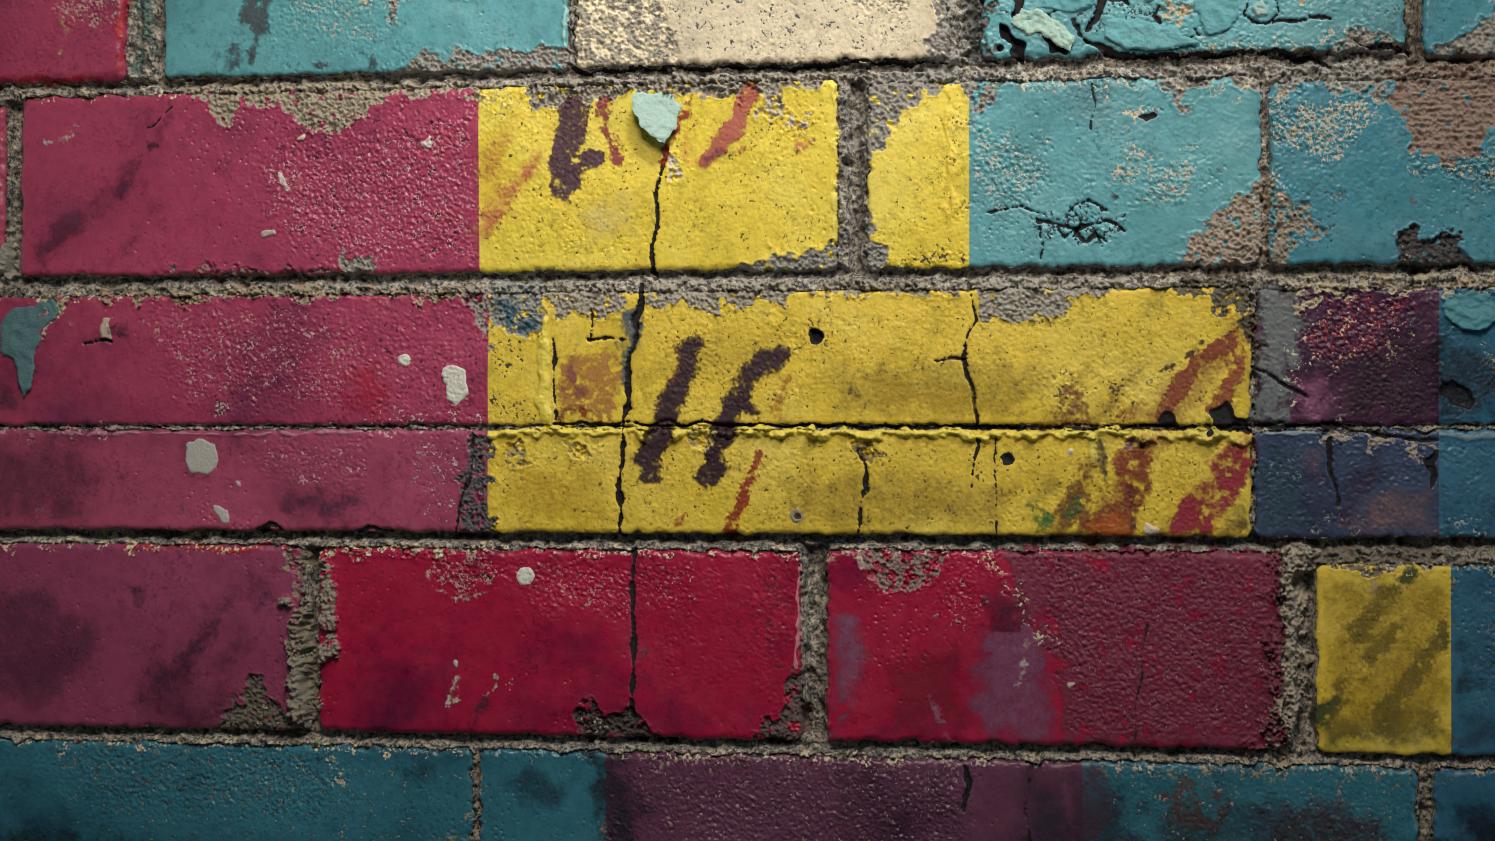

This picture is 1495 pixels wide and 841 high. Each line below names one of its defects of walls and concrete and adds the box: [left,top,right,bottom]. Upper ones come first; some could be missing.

peeling [183,0,1075,182]
crack [1011,0,1410,130]
spalling [1100,0,1495,172]
peeling [0,249,627,397]
peeling [441,365,469,406]
peeling [646,208,1129,324]
crack [552,149,1439,718]
peeling [1148,174,1495,437]
peeling [857,542,953,592]
spalling [201,674,311,744]
spalling [572,697,679,746]
crack [1134,624,1148,741]